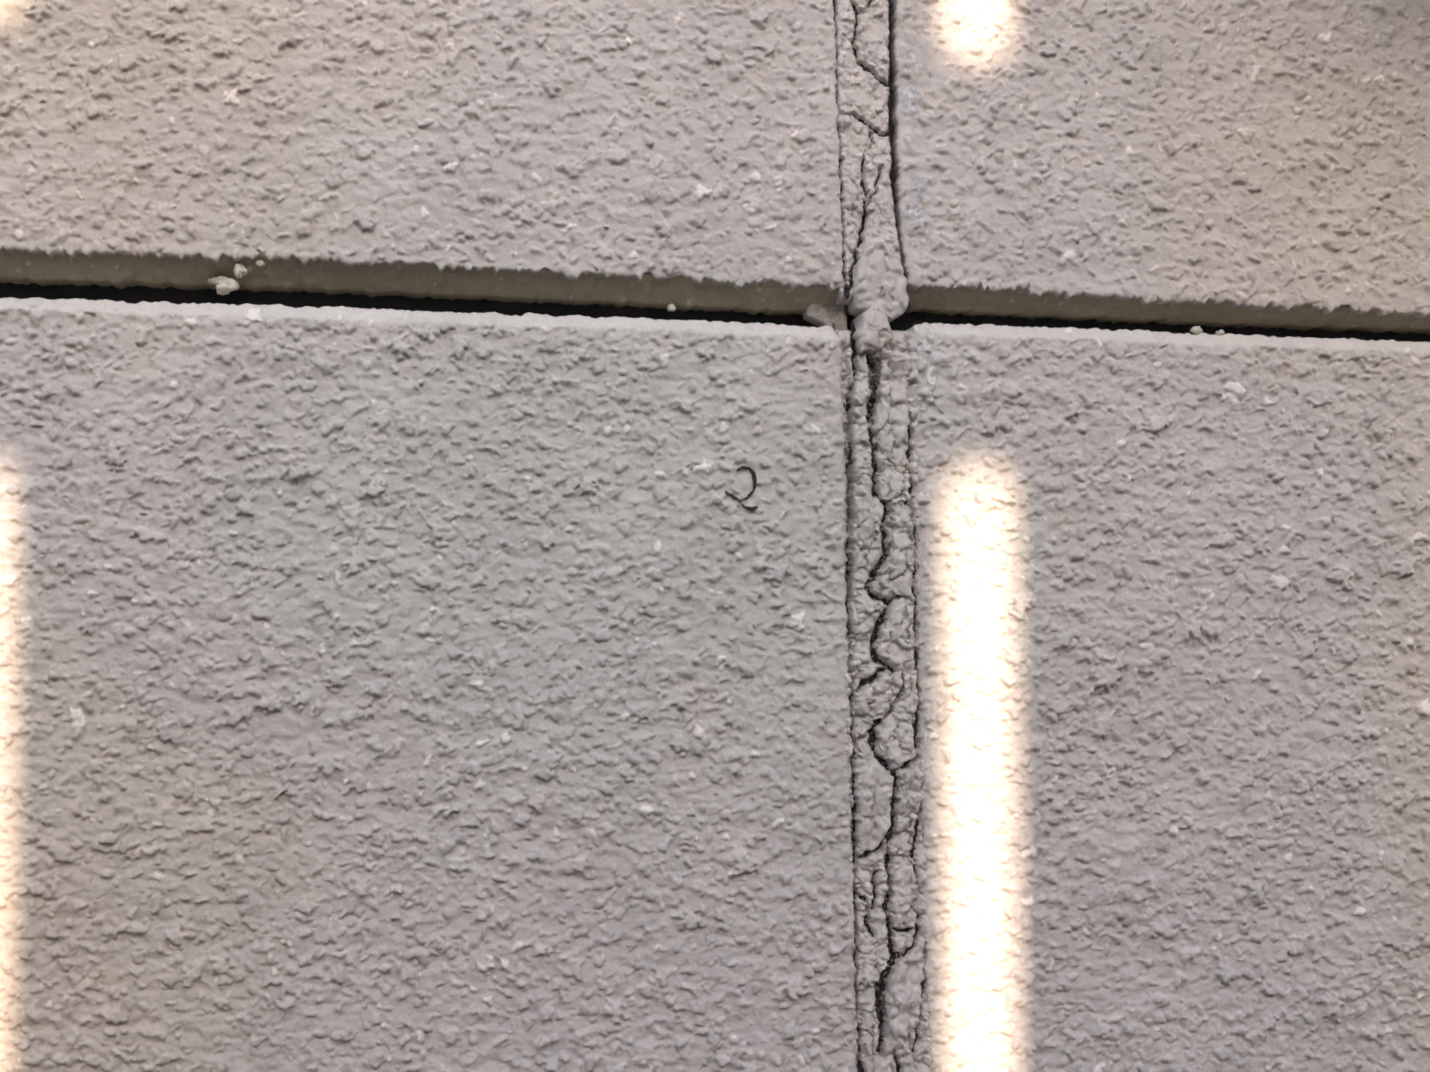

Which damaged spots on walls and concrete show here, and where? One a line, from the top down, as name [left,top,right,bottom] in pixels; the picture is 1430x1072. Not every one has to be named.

crack [833,0,925,1072]